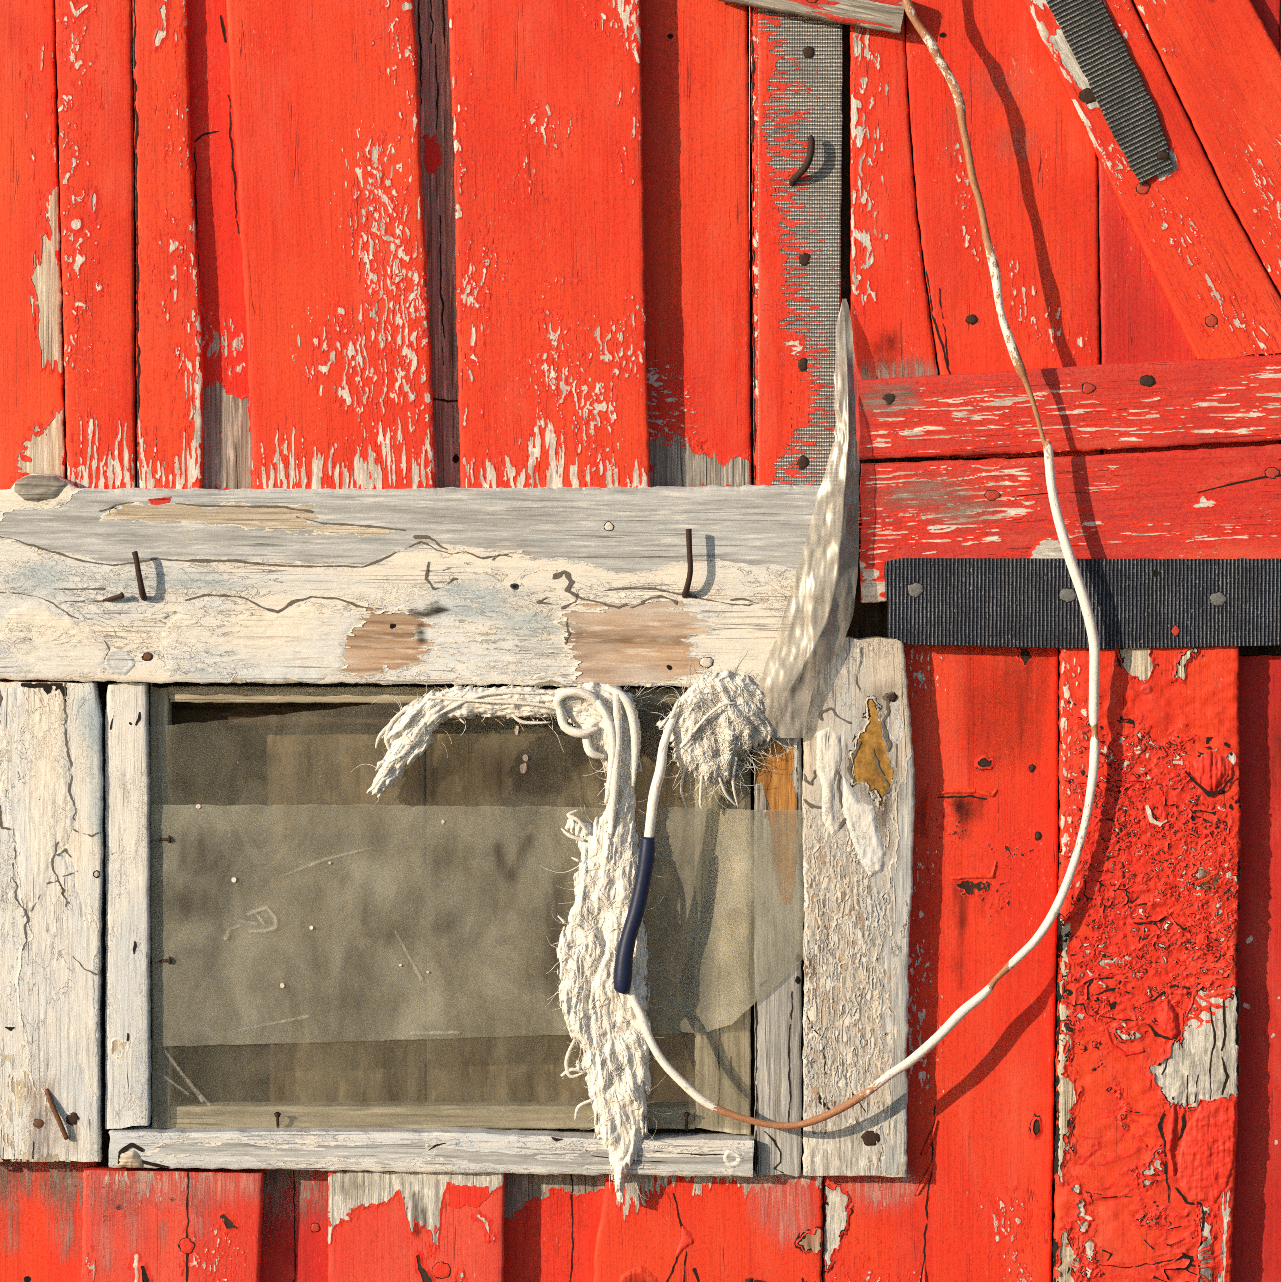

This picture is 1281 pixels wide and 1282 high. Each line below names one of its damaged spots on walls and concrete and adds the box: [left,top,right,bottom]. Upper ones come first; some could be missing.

crack [0,503,511,621]
peeling [0,0,835,687]
crack [536,570,756,645]
peeling [857,0,1281,603]
crack [1060,760,1241,1282]